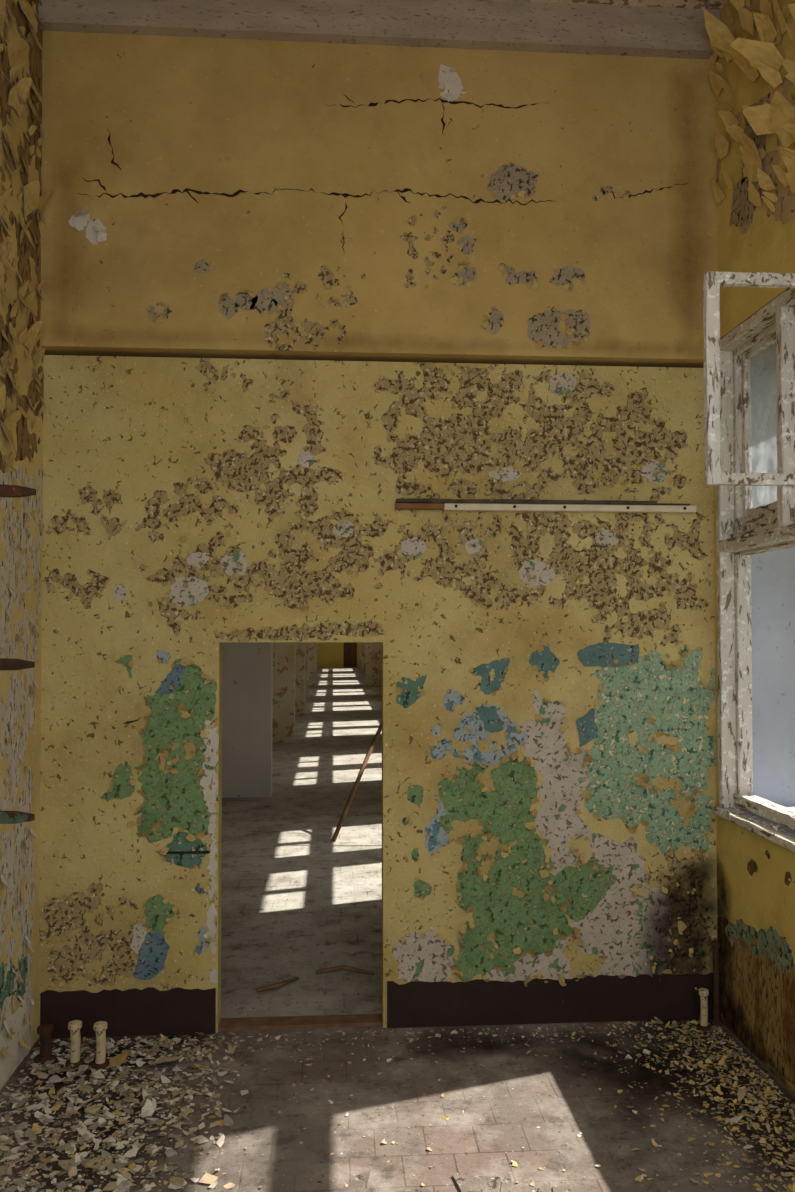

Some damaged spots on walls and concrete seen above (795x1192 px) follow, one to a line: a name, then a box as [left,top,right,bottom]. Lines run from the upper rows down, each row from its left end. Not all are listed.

crack [323,93,550,136]
peeling [438,64,466,102]
peeling [559,0,795,234]
peeling [218,265,366,352]
crack [78,129,551,250]
peeling [400,206,477,289]
peeling [527,307,590,349]
peeling [368,362,688,501]
peeling [0,0,180,1090]
peeling [135,389,795,1086]
peeling [101,650,219,984]
damp [650,864,794,1095]